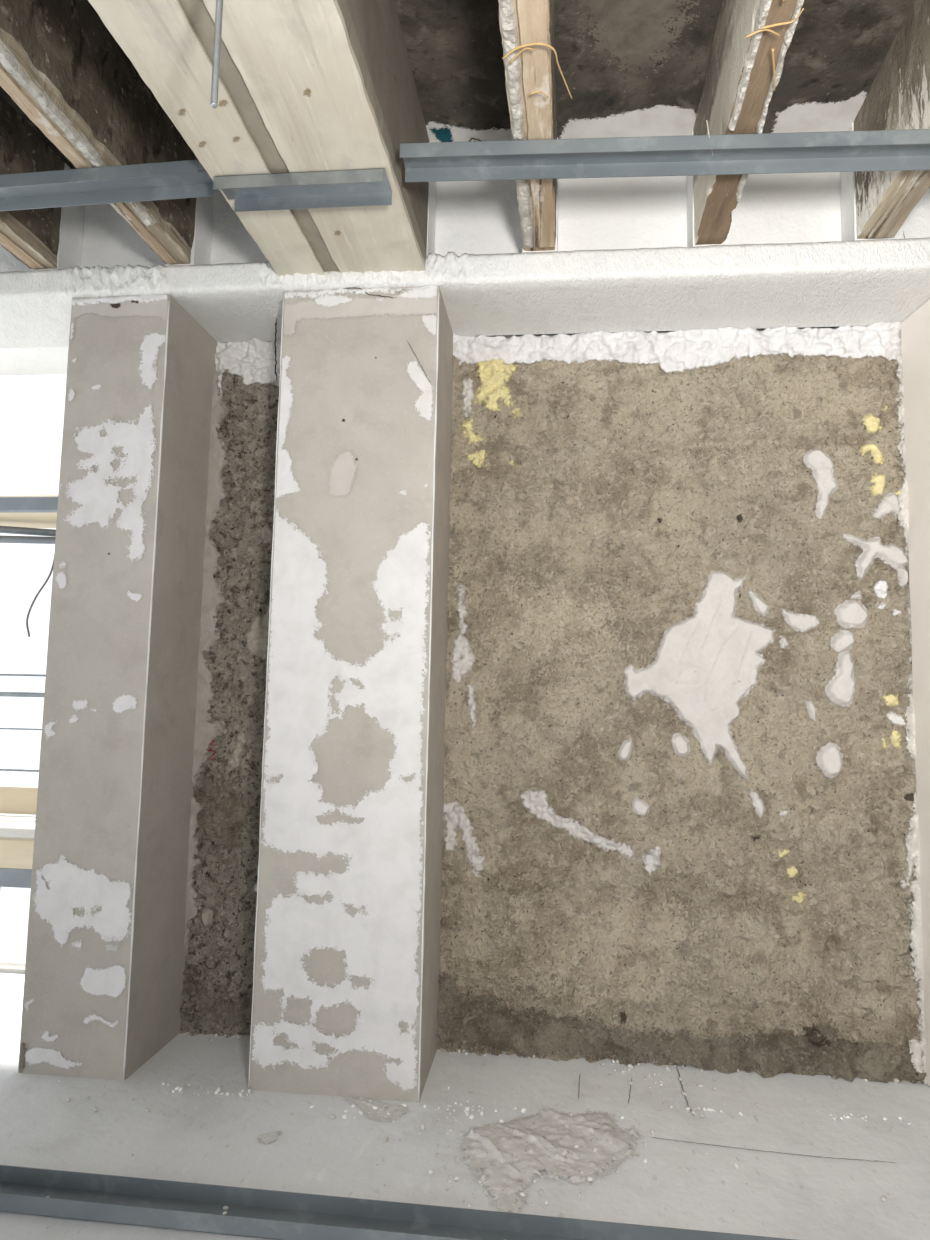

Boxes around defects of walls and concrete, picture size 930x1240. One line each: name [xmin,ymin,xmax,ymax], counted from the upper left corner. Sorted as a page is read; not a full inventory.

flaking render [44,699,96,743]
flaking render [83,1014,119,1028]